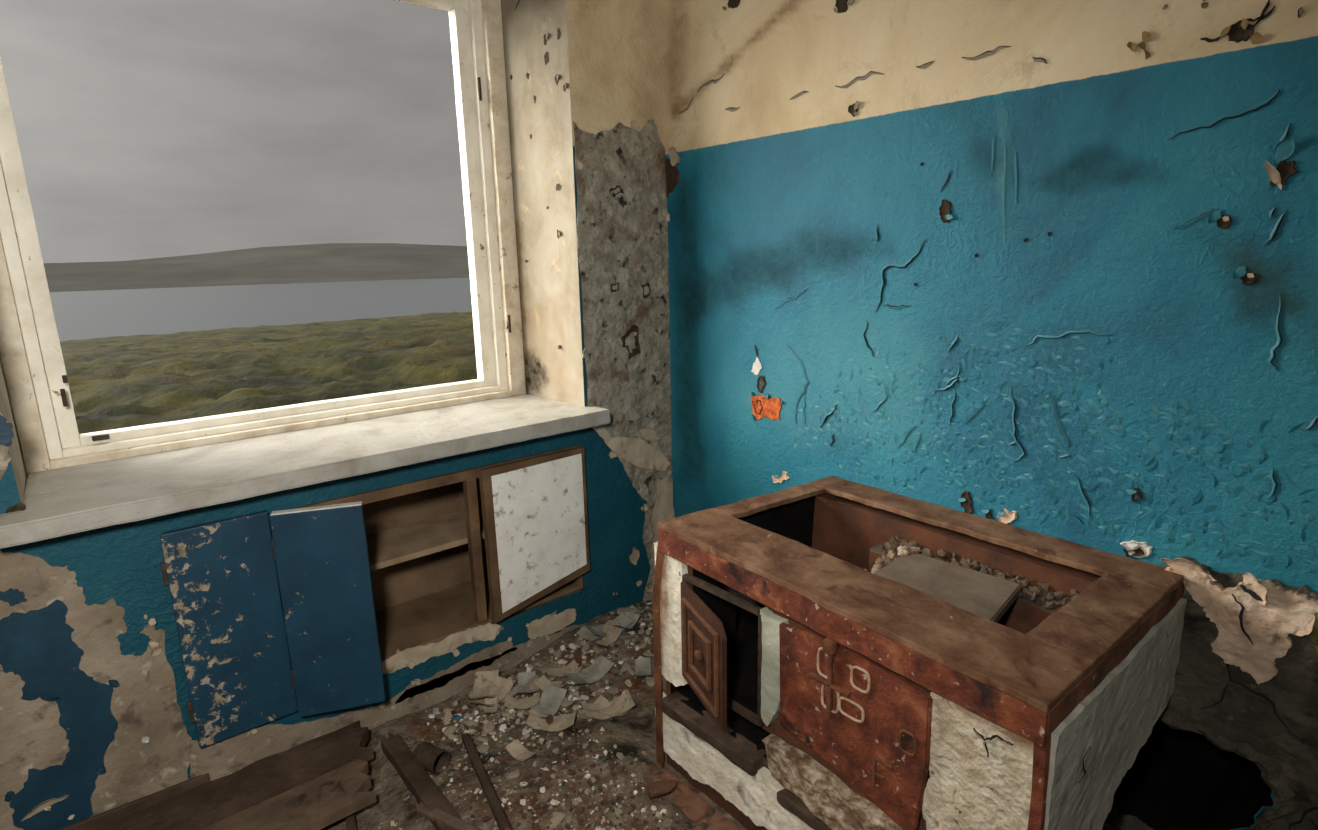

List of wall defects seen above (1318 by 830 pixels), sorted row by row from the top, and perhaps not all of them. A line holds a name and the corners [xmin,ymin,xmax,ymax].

spalling [1200,0,1275,44]
crack [1167,89,1291,141]
crack [1264,207,1288,246]
peeling [0,412,14,480]
peeling [556,119,681,601]
flaking render [750,345,783,421]
crack [787,345,837,447]
crack [862,225,926,358]
crack [898,334,1026,462]
crack [1266,295,1283,372]
peeling [0,551,586,830]
flaking render [1120,540,1318,830]